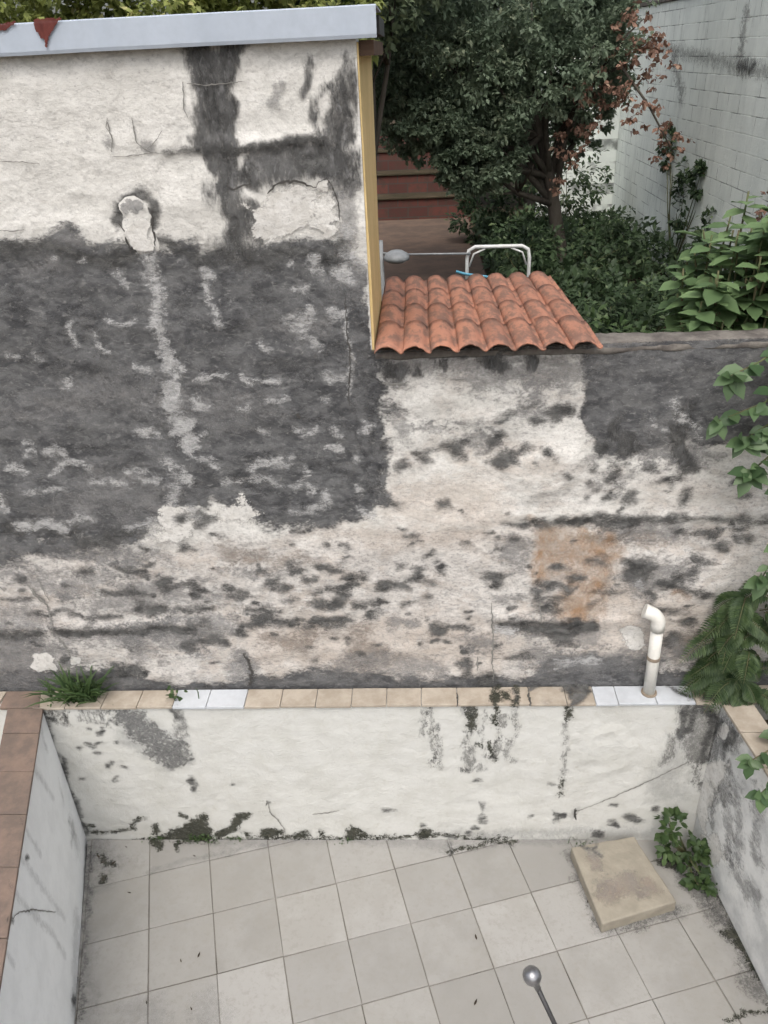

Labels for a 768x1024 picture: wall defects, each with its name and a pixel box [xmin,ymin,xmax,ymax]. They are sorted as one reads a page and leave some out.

crack [106,117,162,157]
peeling [240,178,366,292]
peeling [200,267,222,327]
peeling [285,304,345,352]
leakage [0,44,768,663]
corrosion [532,563,587,615]
crack [243,653,254,686]
leakage [43,709,194,779]
leakage [463,684,592,782]
crack [576,757,699,812]
leakage [664,685,740,825]
crack [7,908,55,921]